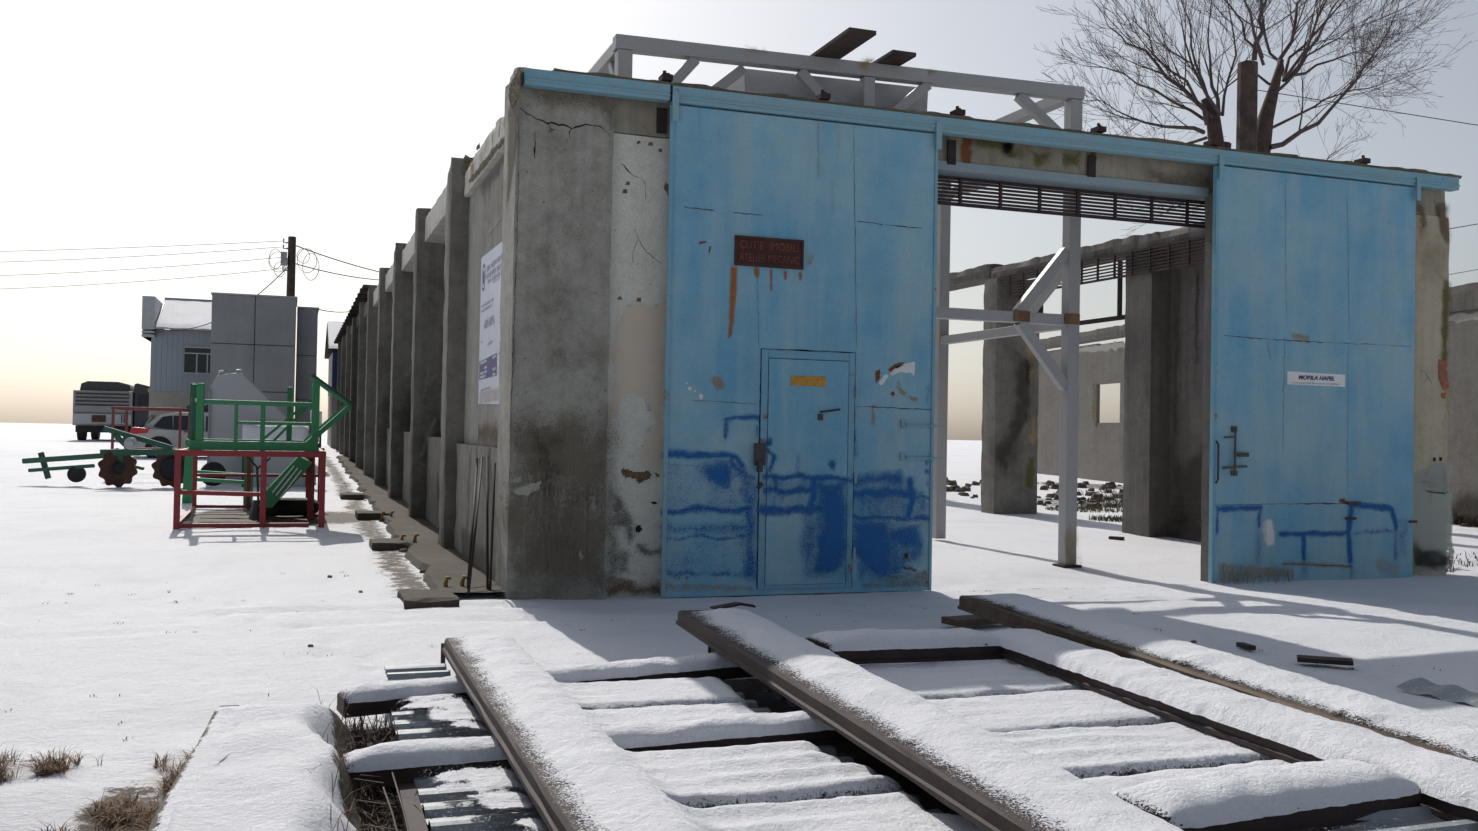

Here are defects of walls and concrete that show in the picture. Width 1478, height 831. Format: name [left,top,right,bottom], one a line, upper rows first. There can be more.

crack [485,108,662,483]
rust [727,253,815,339]
leakage [372,365,662,600]
spalling [621,468,659,484]
peeling [875,362,918,402]
leakage [995,348,1034,484]